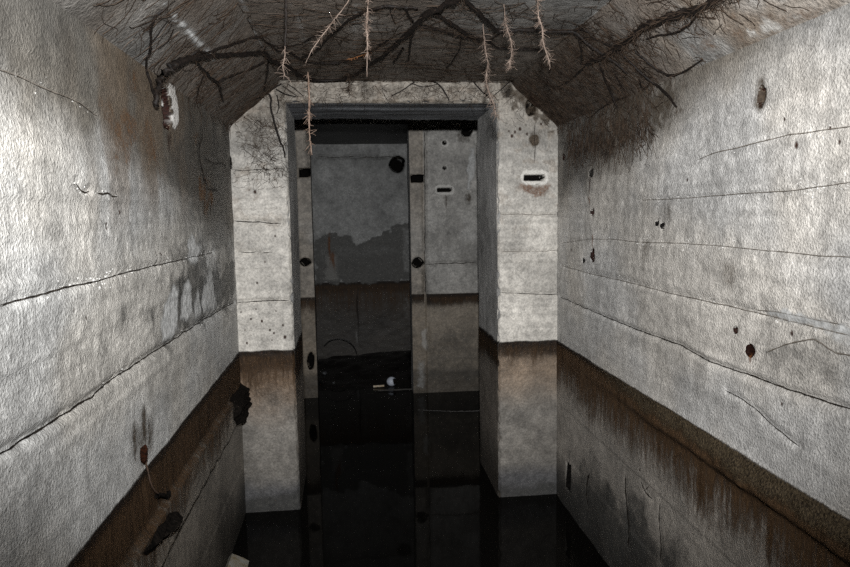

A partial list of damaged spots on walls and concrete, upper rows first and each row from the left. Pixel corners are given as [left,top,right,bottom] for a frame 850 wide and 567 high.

crack [73,182,117,199]
crack [698,124,850,162]
crack [1,243,215,305]
leakage [151,234,235,342]
crack [0,284,288,454]
leakage [479,327,850,567]
crack [501,290,850,409]
crack [725,390,797,445]